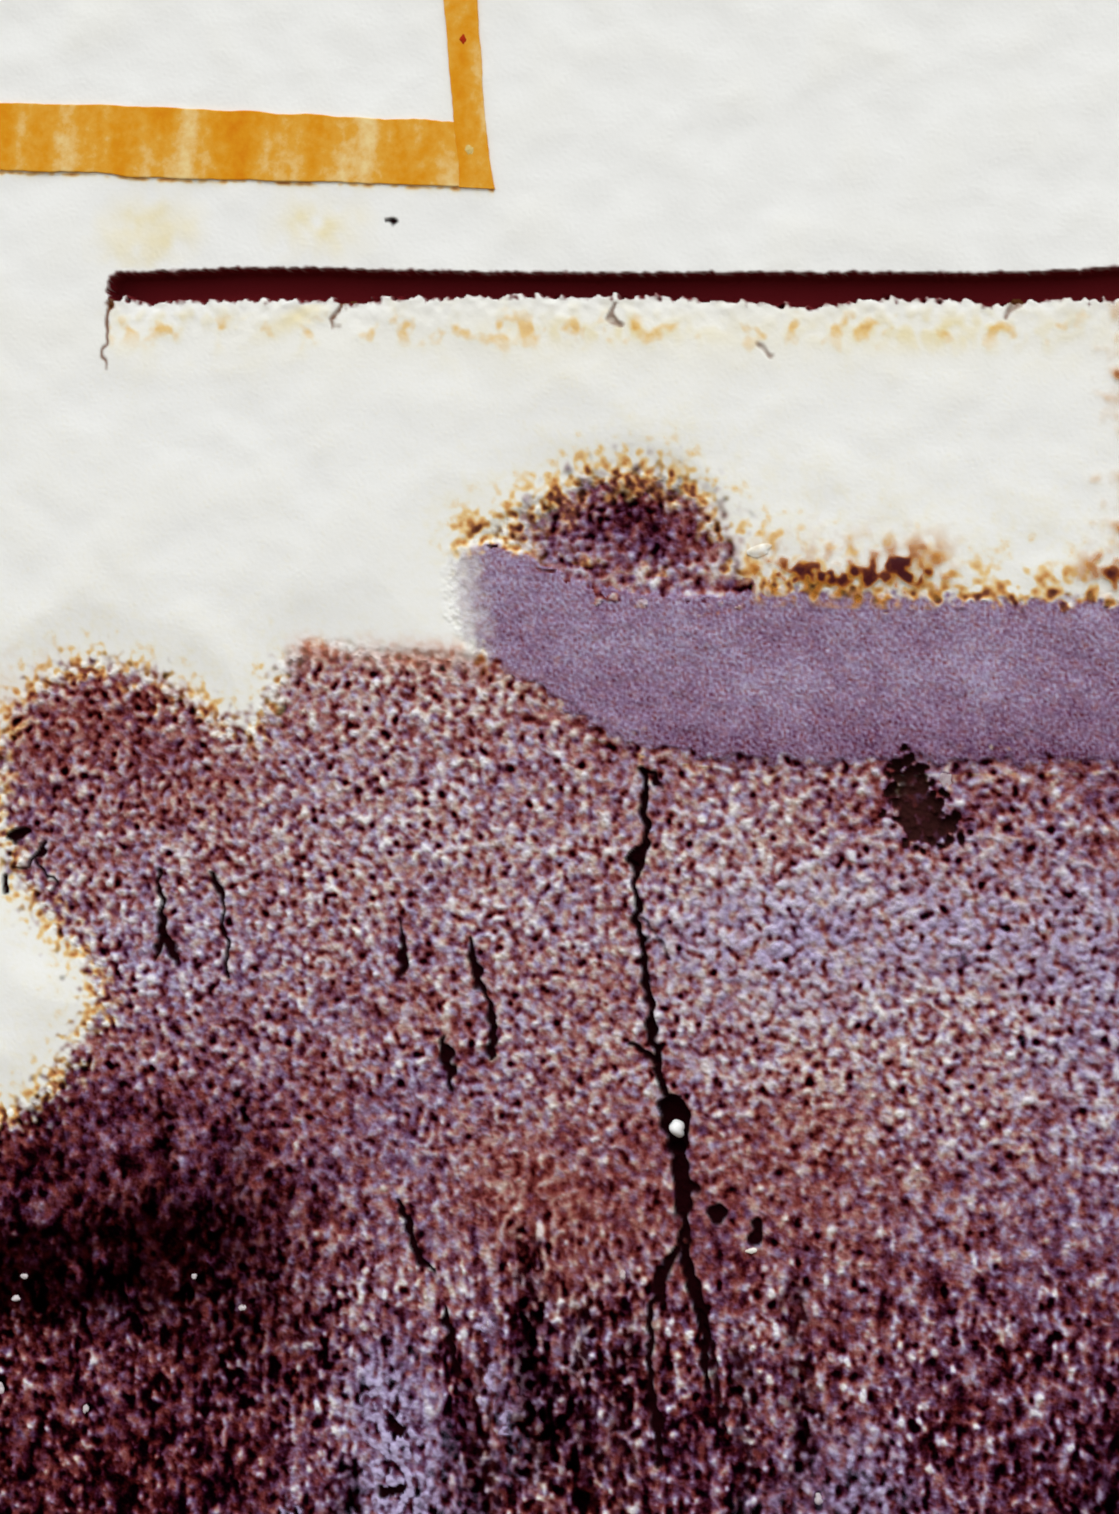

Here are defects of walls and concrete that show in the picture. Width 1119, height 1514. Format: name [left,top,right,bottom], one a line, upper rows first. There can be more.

crack [150,864,181,969]
crack [207,870,232,981]
crack [392,916,411,979]
crack [435,934,501,1095]
crack [622,764,673,1092]
damp [726,901,1085,974]
damp [0,1088,285,1348]
damp [326,1364,436,1514]
damp [459,1227,638,1514]
crack [642,1154,732,1472]
damp [728,1328,761,1514]
damp [779,1280,824,1473]